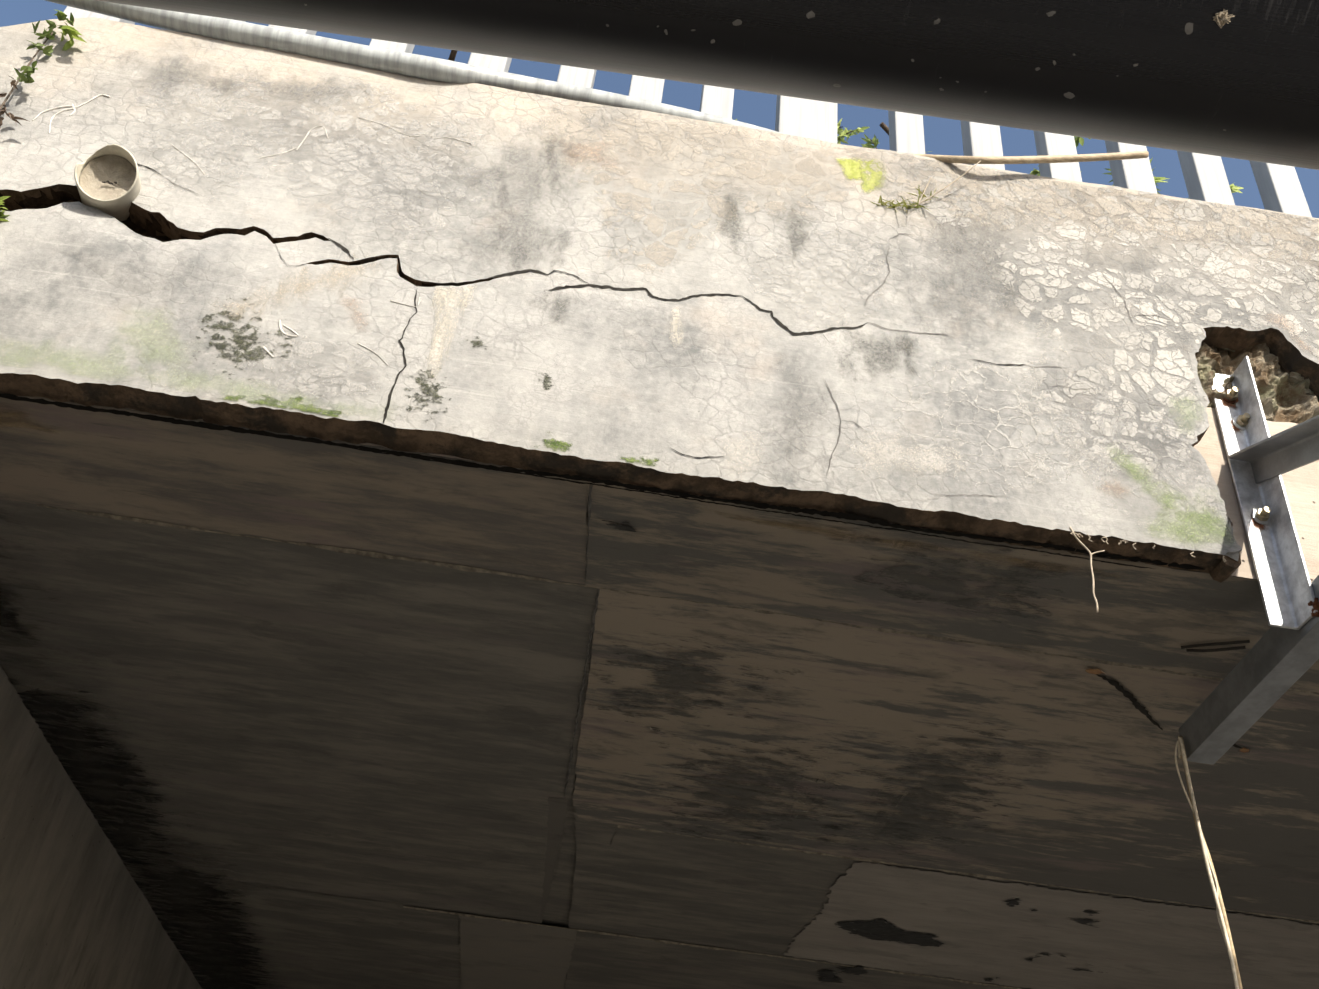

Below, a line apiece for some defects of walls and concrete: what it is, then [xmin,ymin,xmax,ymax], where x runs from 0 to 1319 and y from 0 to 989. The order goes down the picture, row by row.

leakage [196,297,295,379]
crack [0,79,1319,570]
spalling [1196,342,1319,424]
leakage [0,585,276,989]
leakage [588,640,1029,855]